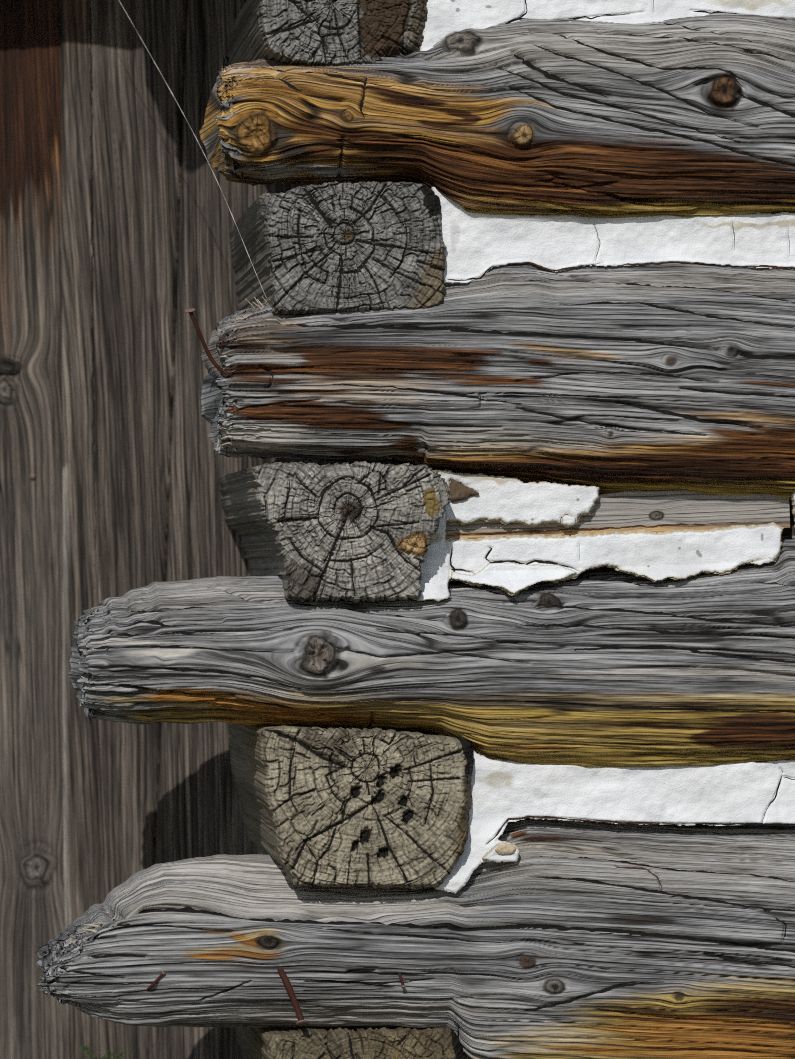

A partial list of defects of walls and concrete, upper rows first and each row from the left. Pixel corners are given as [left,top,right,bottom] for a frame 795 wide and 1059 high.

crack [501,0,527,25]
crack [569,0,654,20]
crack [447,514,778,597]
flaking render [446,485,784,596]
crack [487,769,795,844]